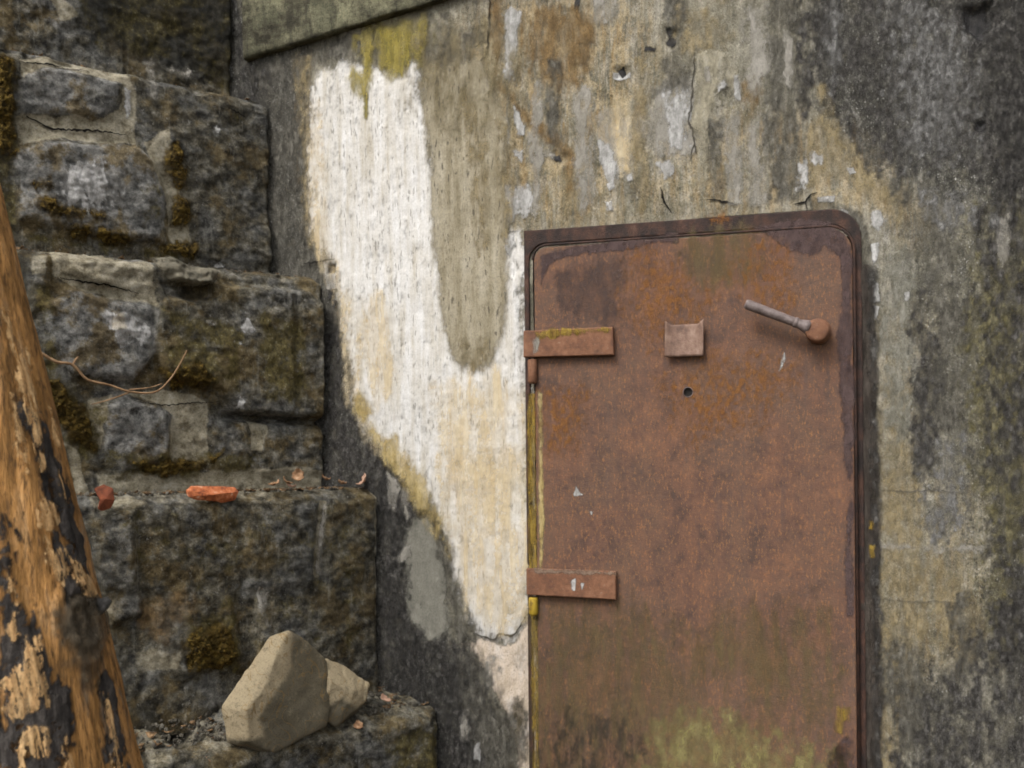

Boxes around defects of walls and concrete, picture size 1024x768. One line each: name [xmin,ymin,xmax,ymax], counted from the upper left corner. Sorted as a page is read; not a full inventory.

spalling [644,0,685,51]
spalling [613,67,631,80]
damp [663,59,690,92]
crack [26,116,128,136]
crack [688,53,697,162]
peeling [648,50,741,181]
damp [231,0,561,768]
damp [708,0,1024,768]
crack [472,614,527,643]